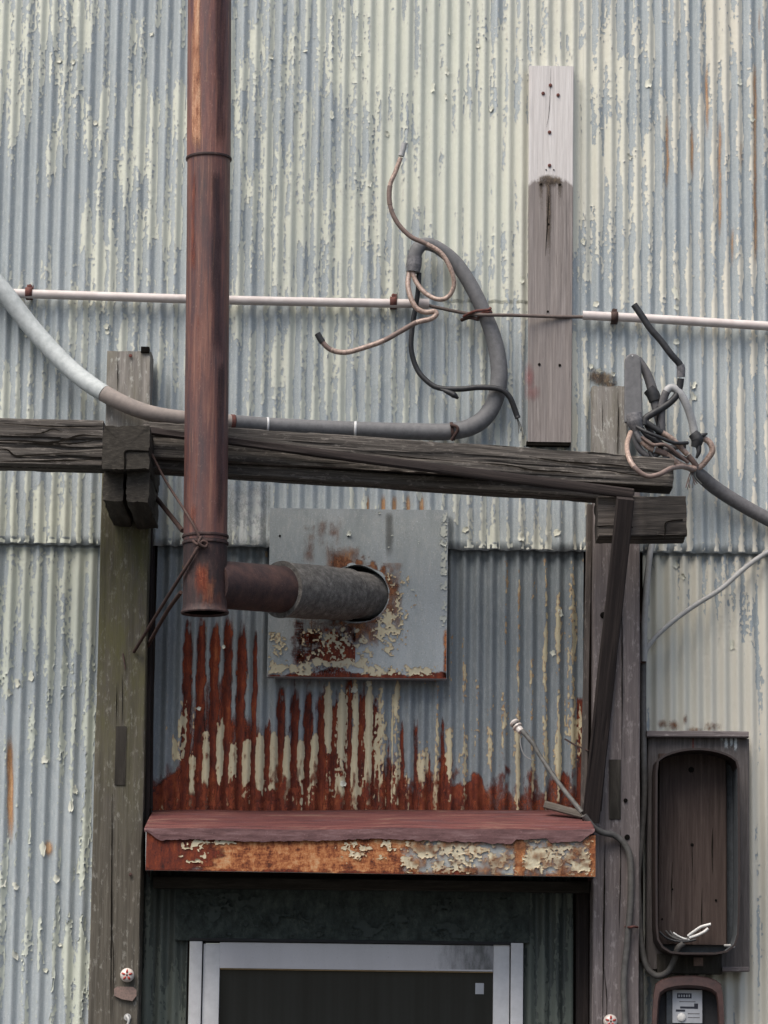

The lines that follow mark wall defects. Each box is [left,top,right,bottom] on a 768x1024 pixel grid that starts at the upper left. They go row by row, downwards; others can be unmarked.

peeling [0,0,187,401]
peeling [0,330,98,420]
peeling [158,476,184,544]
peeling [229,0,768,1024]
peeling [0,471,100,1024]
peeling [179,839,237,876]
rust [152,551,582,811]
peeling [155,492,586,811]
rust [146,832,596,877]